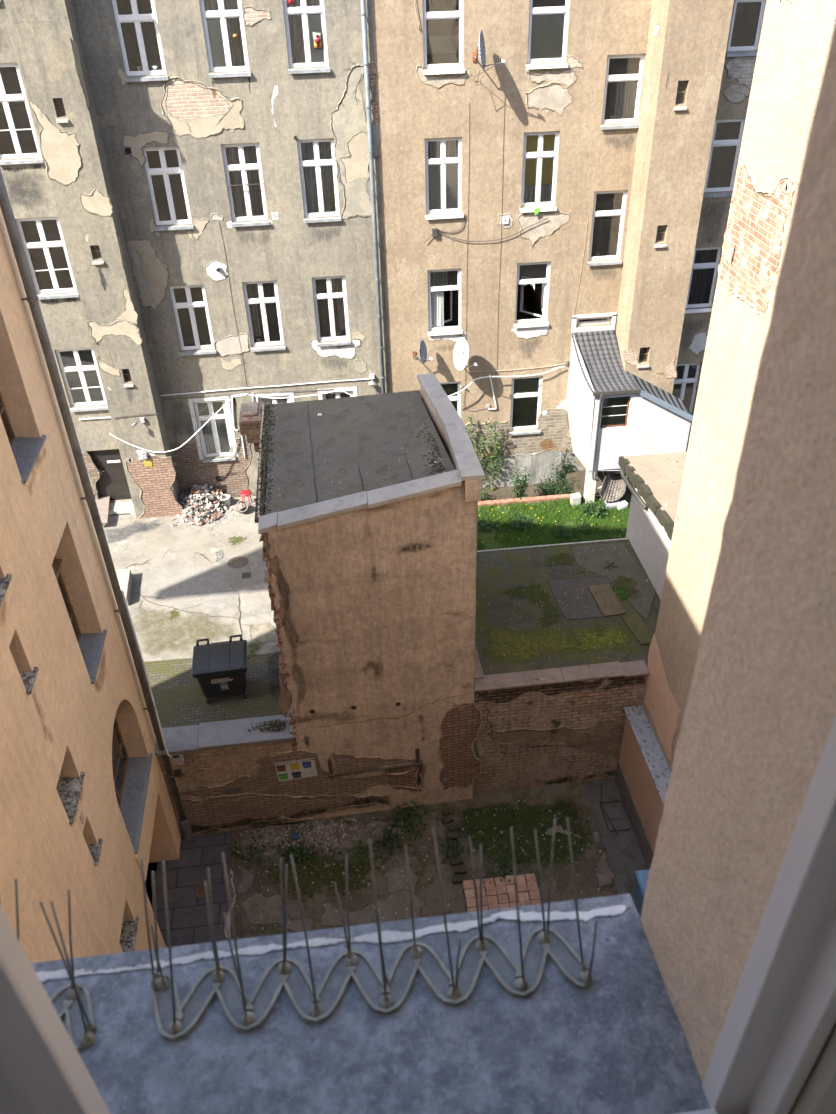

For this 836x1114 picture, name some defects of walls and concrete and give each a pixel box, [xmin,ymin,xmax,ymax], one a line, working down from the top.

peeling [28,99,113,217]
peeling [122,76,245,171]
peeling [330,61,382,220]
peeling [525,55,583,116]
flaking render [721,56,757,104]
peeling [497,209,571,248]
flaking render [718,157,799,317]
peeling [87,217,170,391]
spalling [249,525,289,643]
flaking render [436,676,646,791]
flaking render [169,749,425,837]